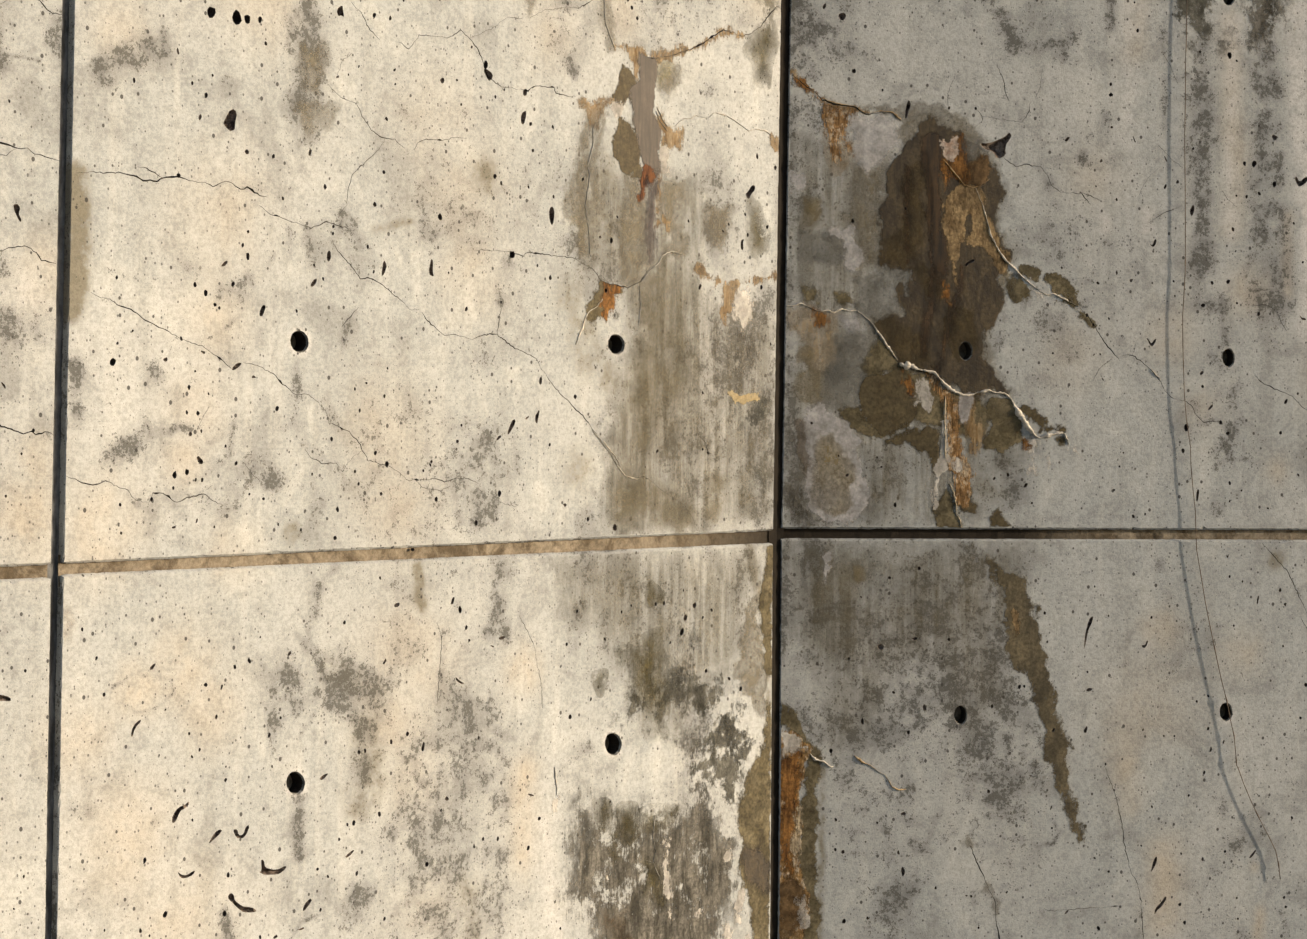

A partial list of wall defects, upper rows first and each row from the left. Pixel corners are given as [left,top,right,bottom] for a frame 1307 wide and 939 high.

crack [645,6,780,59]
rust [790,68,870,169]
spalling [981,133,1011,158]
damp [1174,0,1229,52]
damp [1244,0,1281,49]
crack [0,0,695,524]
damp [786,98,1097,528]
damp [564,545,834,939]
rust [779,730,813,939]
damp [961,544,1087,843]